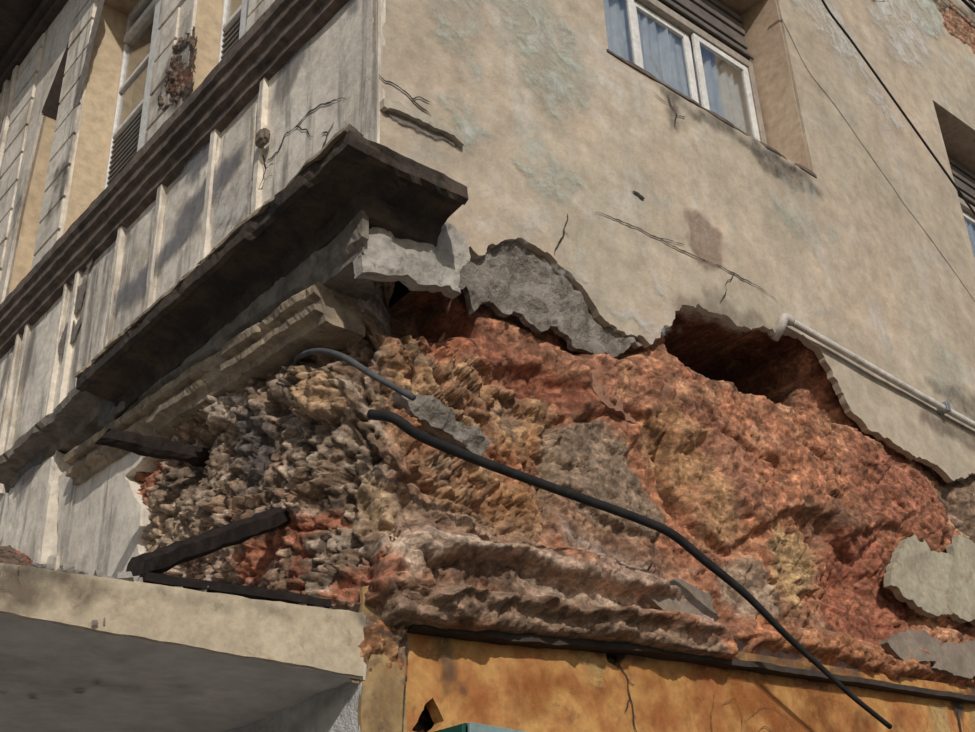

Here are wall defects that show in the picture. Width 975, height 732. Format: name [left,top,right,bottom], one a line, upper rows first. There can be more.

spalling [157,26,197,112]
crack [379,74,431,116]
peeling [794,0,864,73]
peeling [869,0,975,65]
crack [258,97,347,189]
crack [554,214,568,255]
crack [595,212,781,305]
spalling [689,212,722,267]
spalling [135,222,975,692]
spalling [412,706,434,732]
crack [617,660,637,732]